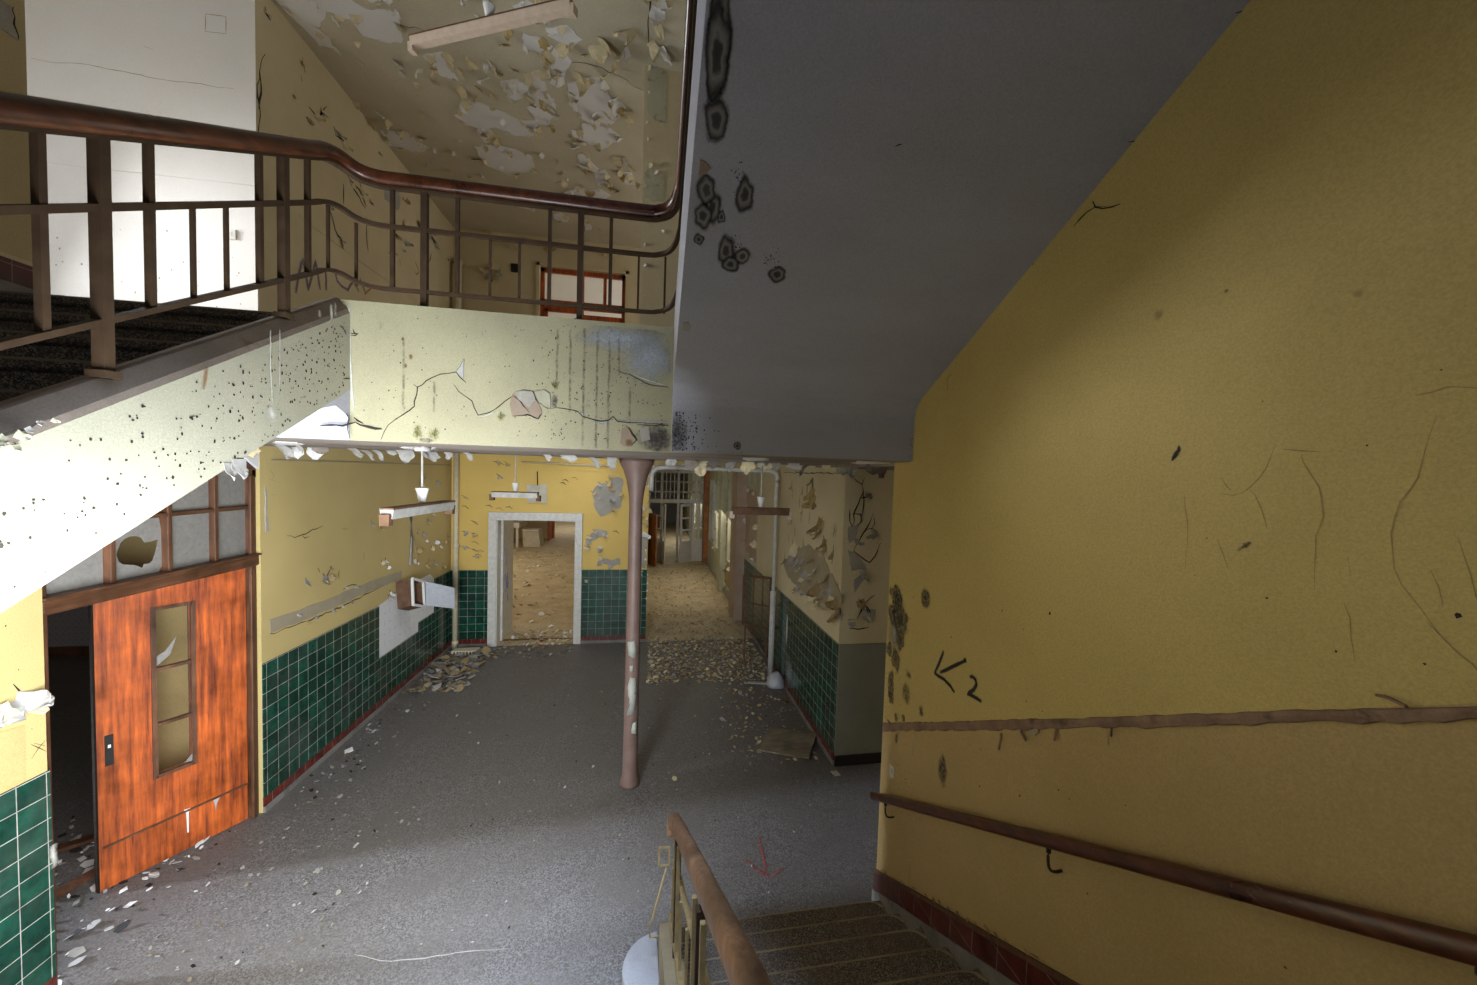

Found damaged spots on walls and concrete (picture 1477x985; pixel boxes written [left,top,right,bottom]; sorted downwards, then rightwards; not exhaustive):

peeling [264,0,675,201]
damp [704,0,732,141]
peeling [330,176,453,265]
damp [694,161,785,283]
peeling [0,418,61,452]
peeling [223,441,473,488]
crack [320,360,511,439]
peeling [543,427,637,583]
crack [550,407,665,424]
peeling [641,457,889,638]
crack [1391,387,1477,670]
peeling [0,684,55,728]